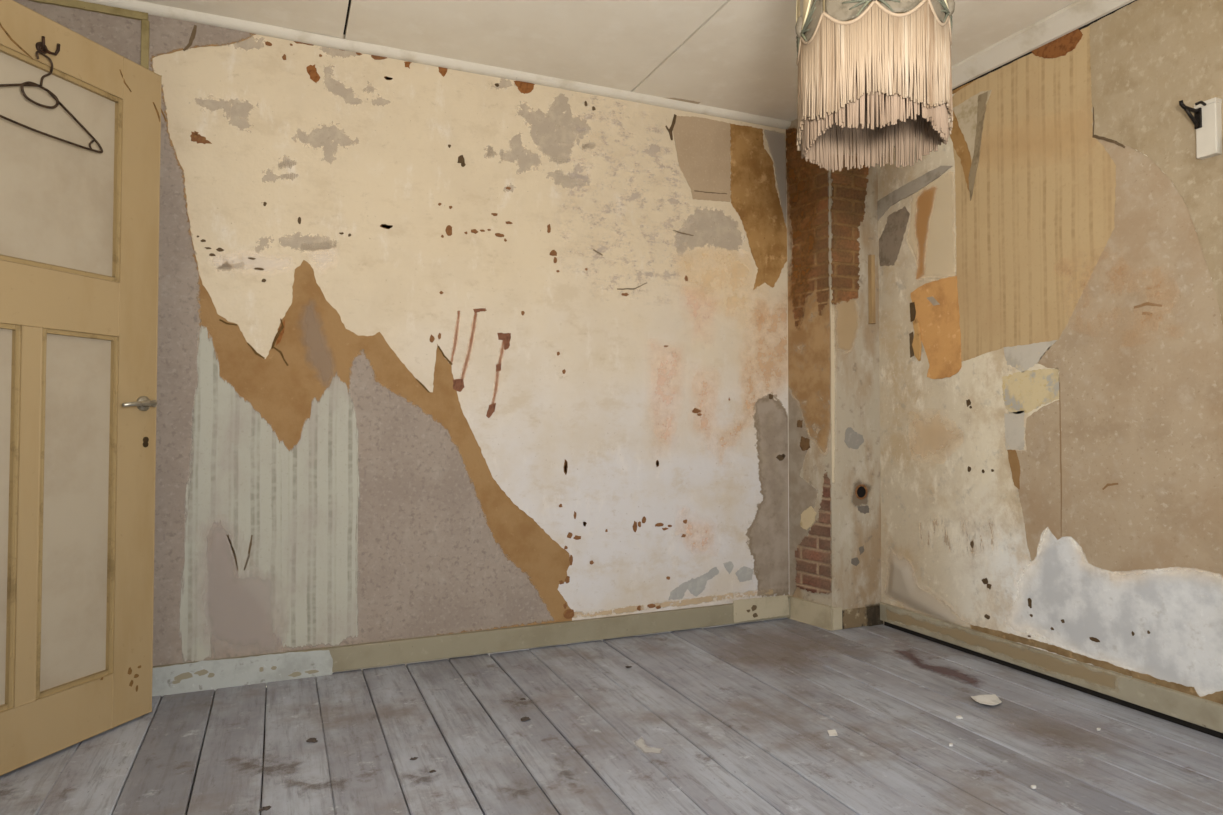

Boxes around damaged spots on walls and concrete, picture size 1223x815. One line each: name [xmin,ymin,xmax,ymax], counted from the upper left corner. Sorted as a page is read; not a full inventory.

peeling [195,95,258,132]
peeling [292,122,359,164]
peeling [320,47,393,106]
peeling [484,93,624,195]
peeling [255,232,336,253]
peeling [643,145,745,256]
corrosion [430,308,486,392]
corrosion [486,333,511,418]
flaking render [733,128,869,623]
peeling [1002,340,1059,450]
peeling [668,561,753,600]
peeling [970,614,1223,704]